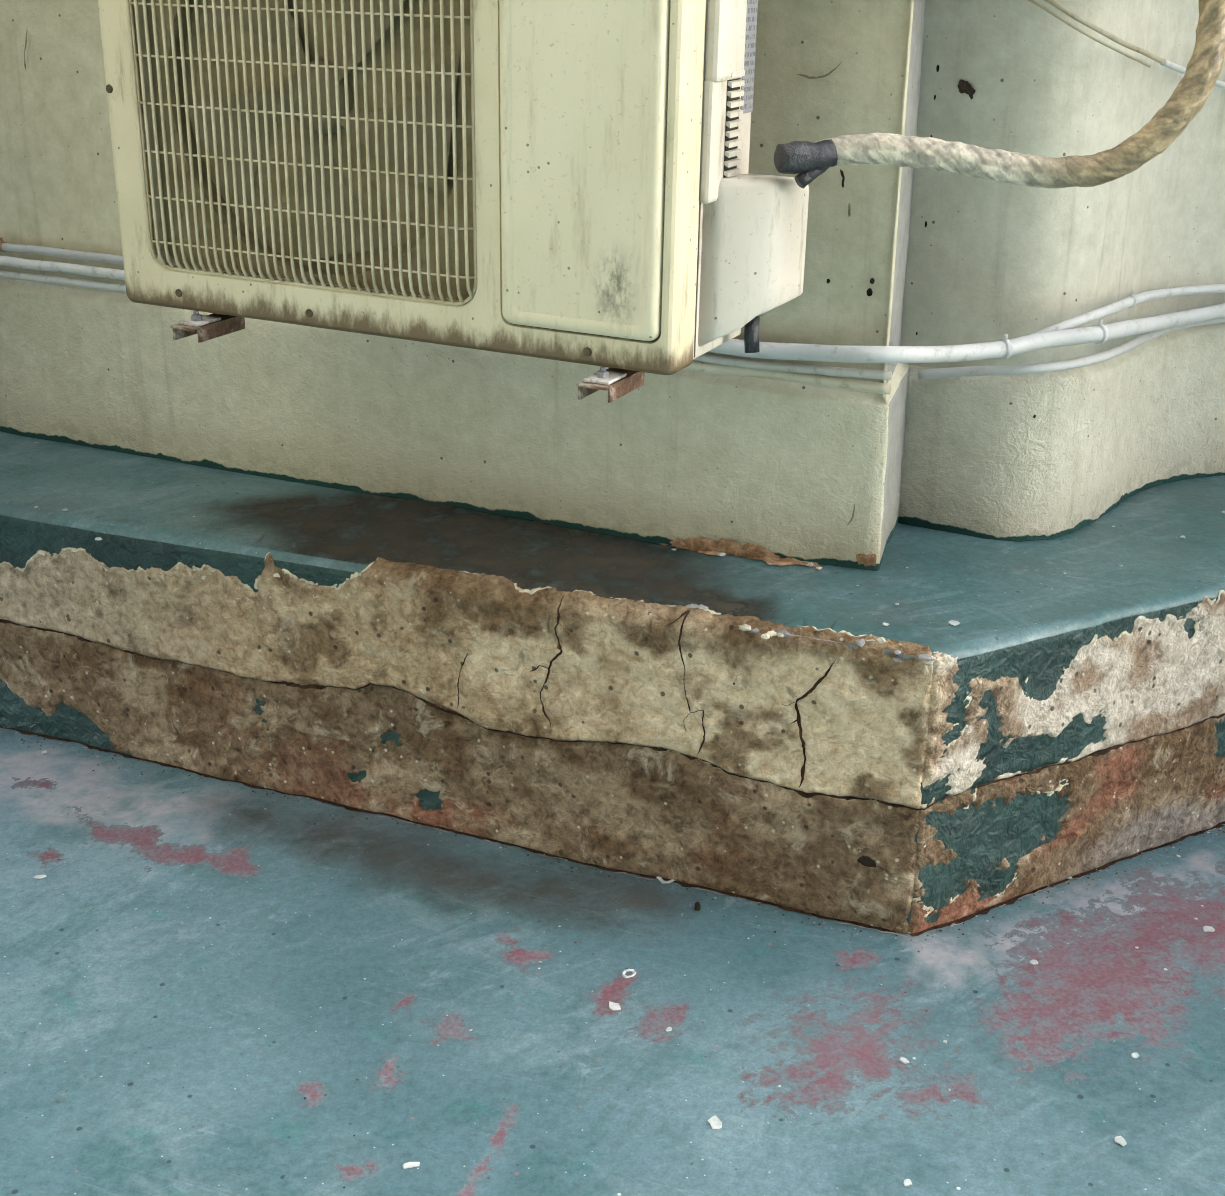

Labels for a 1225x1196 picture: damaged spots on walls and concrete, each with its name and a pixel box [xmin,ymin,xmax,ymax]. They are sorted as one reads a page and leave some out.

water stain [225,495,768,620]
spalling [659,537,822,570]
crack [0,594,1225,811]
crack [0,725,1225,938]
peeling [0,547,1225,1127]